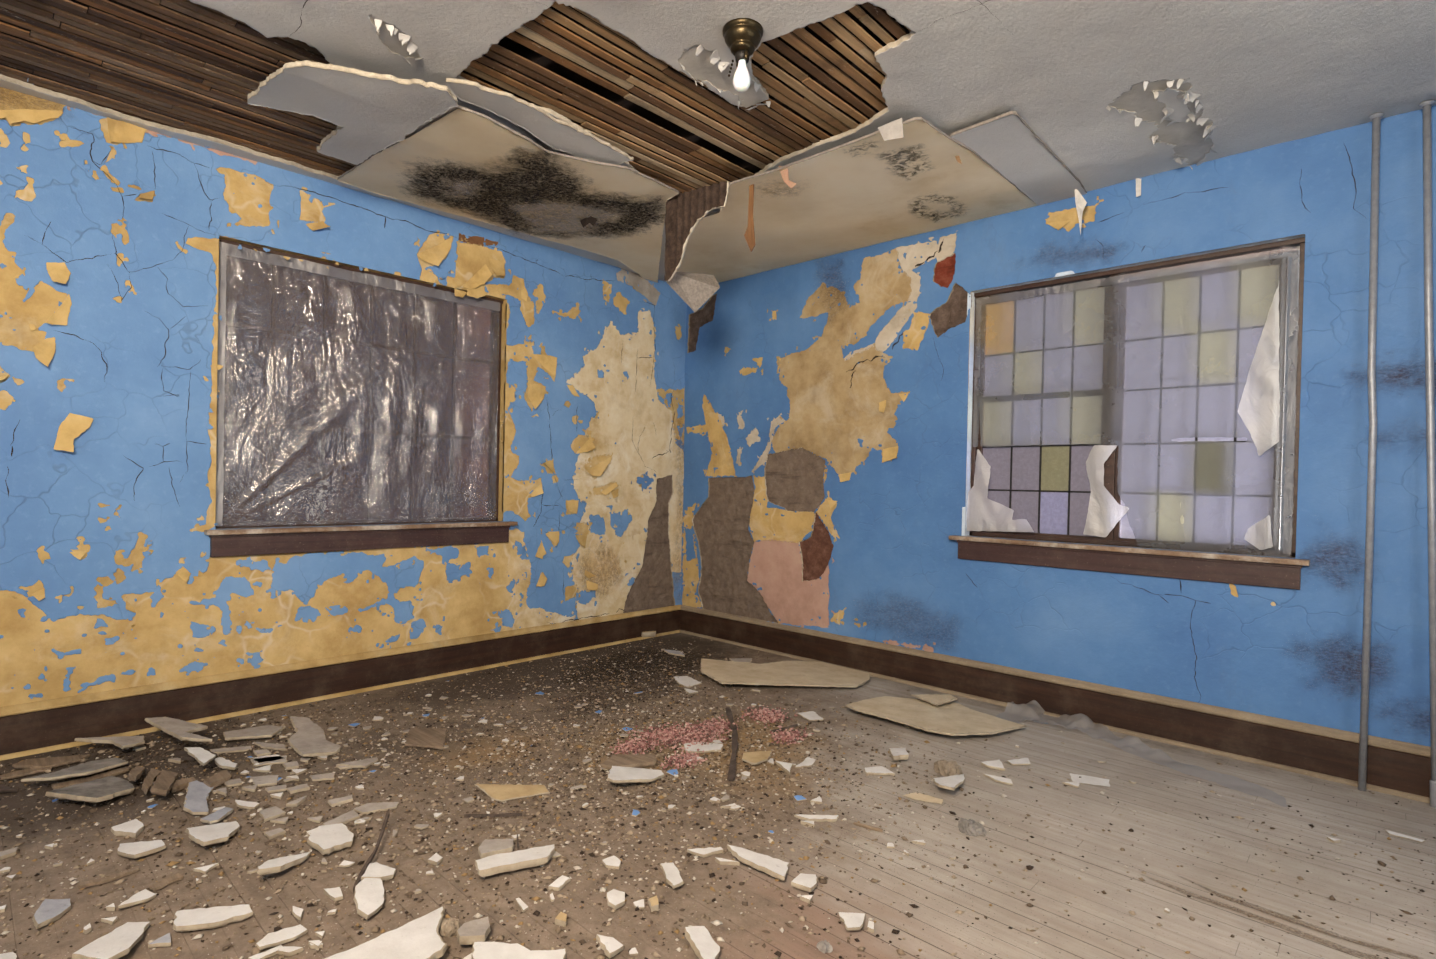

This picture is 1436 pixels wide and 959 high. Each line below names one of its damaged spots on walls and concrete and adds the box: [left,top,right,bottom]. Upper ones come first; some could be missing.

peeling [678,45,771,110]
peeling [1105,78,1218,170]
peeling [300,187,335,230]
crack [271,184,454,237]
damp [406,151,662,237]
crack [487,245,612,281]
crack [24,127,218,504]
peeling [0,87,303,532]
crack [621,302,675,472]
crack [5,420,20,496]
peeling [0,218,972,707]
crack [534,403,578,533]